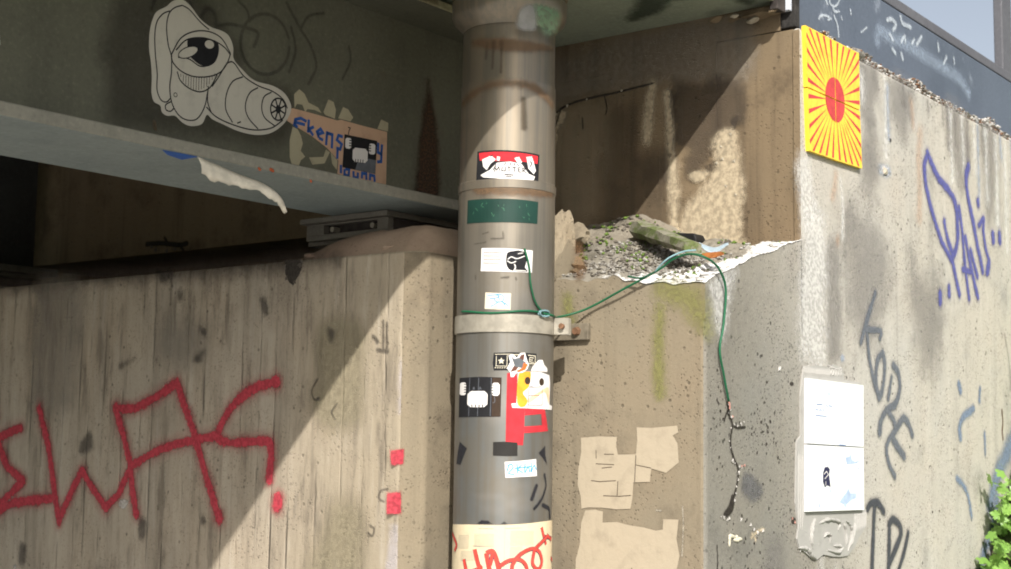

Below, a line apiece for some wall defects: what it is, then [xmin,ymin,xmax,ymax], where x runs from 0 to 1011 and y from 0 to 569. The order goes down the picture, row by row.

spalling [554,209,590,281]
peeling [628,130,791,283]
crack [721,401,746,521]